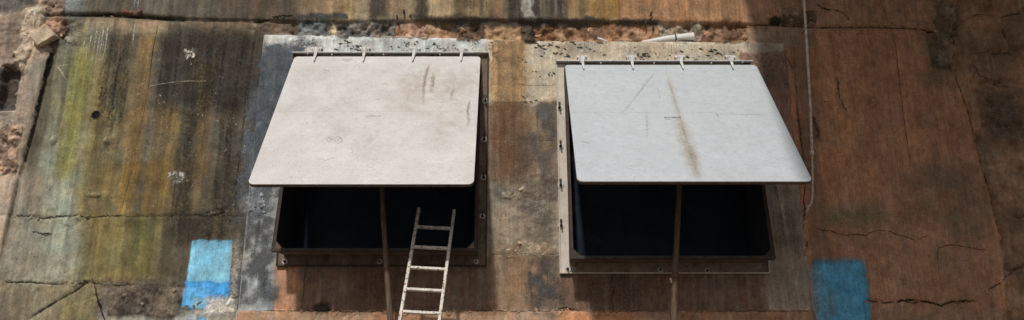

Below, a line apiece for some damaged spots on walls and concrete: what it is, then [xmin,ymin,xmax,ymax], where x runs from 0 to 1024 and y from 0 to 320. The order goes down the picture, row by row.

spalling [11,0,82,72]
spalling [521,11,748,60]
water stain [70,26,135,124]
spalling [0,123,23,174]
crack [11,8,294,236]
crack [742,4,1021,307]
crack [0,279,238,320]